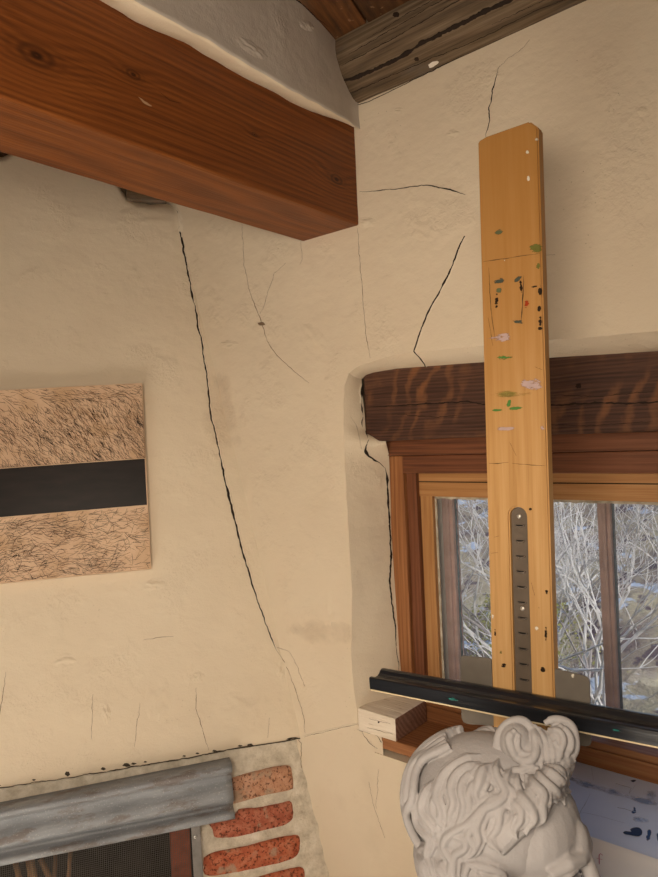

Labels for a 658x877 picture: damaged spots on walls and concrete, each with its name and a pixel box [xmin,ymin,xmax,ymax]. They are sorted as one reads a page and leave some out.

crack [358,50,475,105]
crack [486,41,527,132]
crack [369,185,463,194]
crack [413,236,466,367]
crack [550,391,658,426]
crack [175,205,385,768]
crack [352,384,485,670]